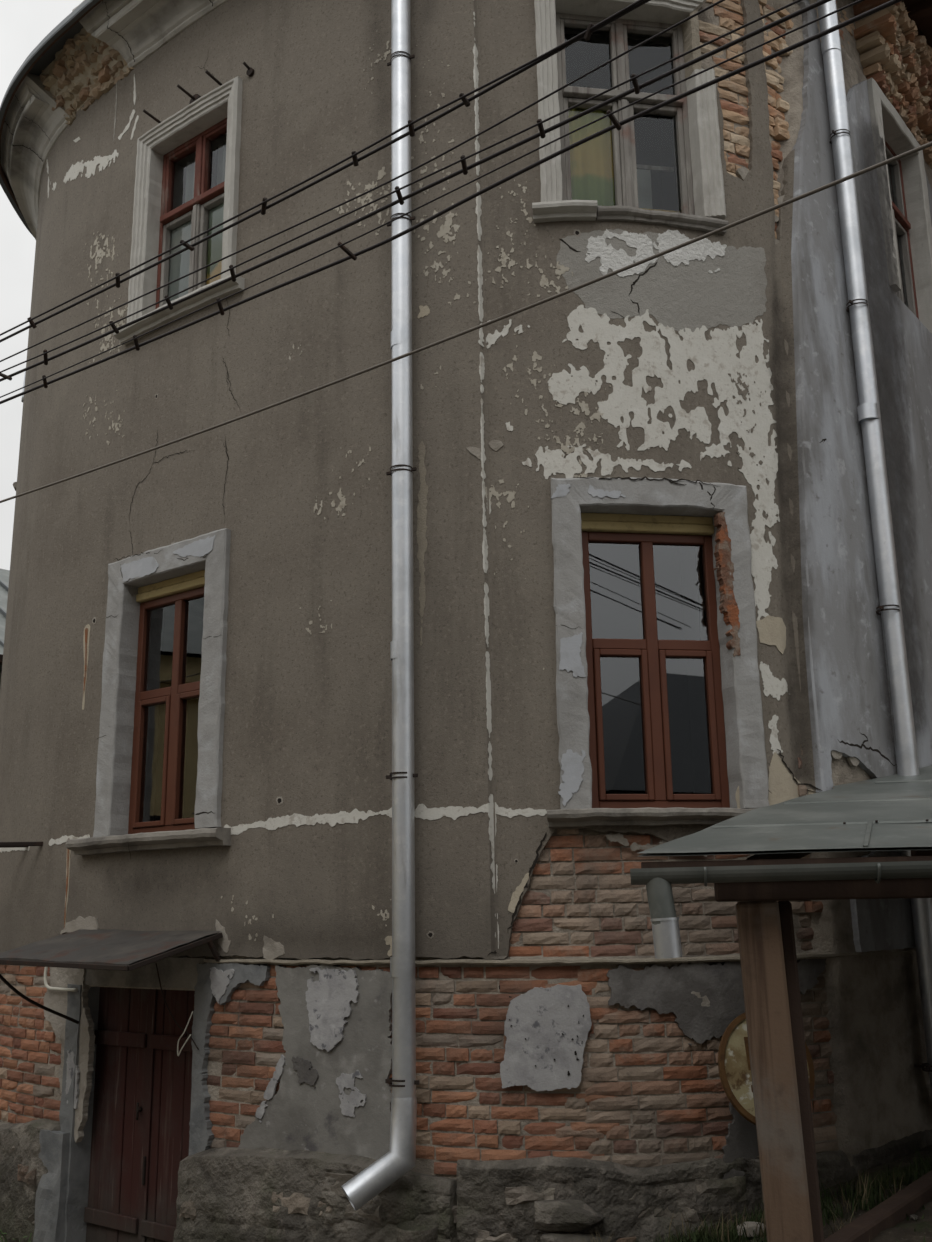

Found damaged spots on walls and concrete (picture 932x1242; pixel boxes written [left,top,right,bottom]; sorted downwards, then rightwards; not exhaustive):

flaking render [836,1,857,49]
peeling [50,109,139,191]
peeling [411,0,794,893]
crack [113,433,208,574]
corrosion [82,624,90,710]
flaking render [759,661,815,805]
flaking render [495,829,750,957]
flaking render [790,901,823,951]
peeling [305,967,359,1052]
peeling [256,1054,319,1123]
peeling [336,1070,366,1118]